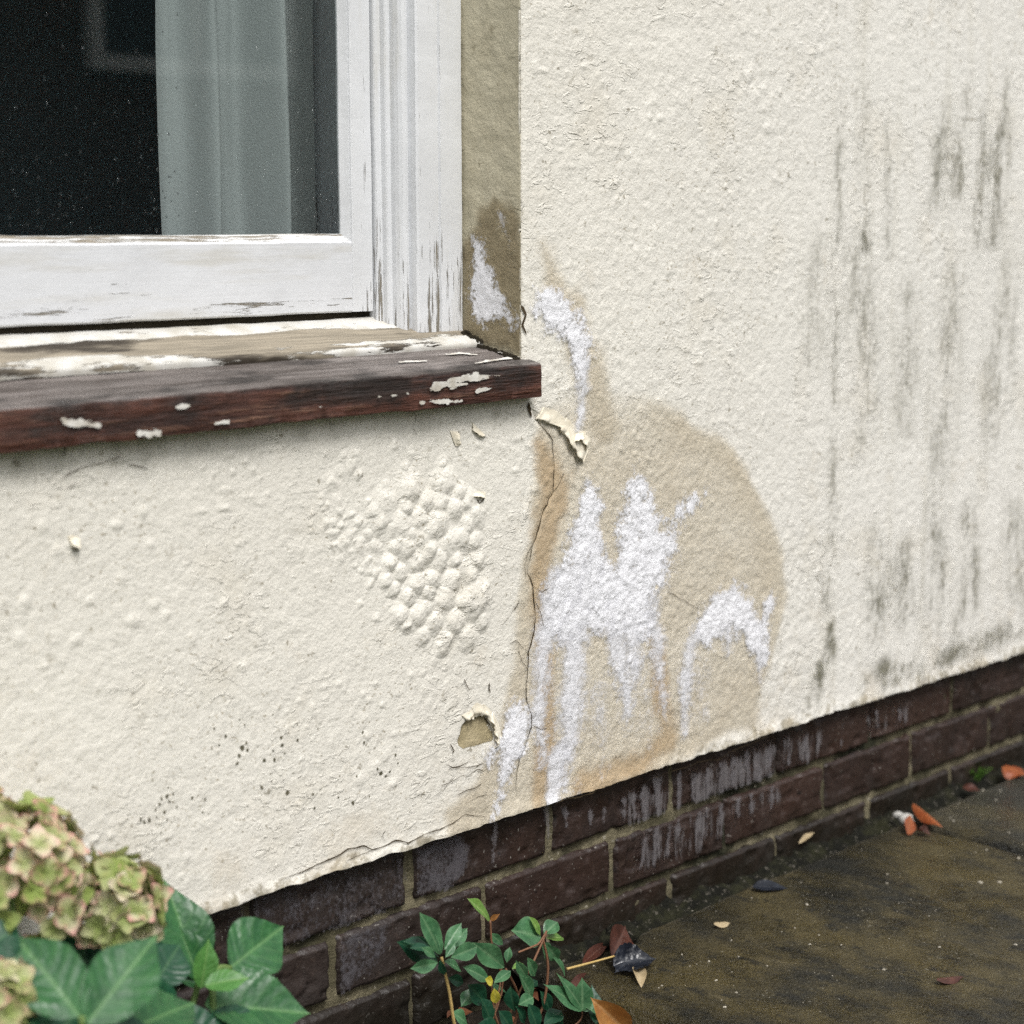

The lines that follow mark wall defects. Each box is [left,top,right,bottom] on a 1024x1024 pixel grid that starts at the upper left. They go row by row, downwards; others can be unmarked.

water stain [977,150,1002,239]
water stain [463,200,613,436]
peeling [419,352,513,405]
peeling [61,418,102,428]
peeling [136,429,162,438]
peeling [536,407,591,463]
crack [499,403,564,792]
water stain [417,412,789,893]
water stain [809,621,836,699]
water stain [876,660,898,685]
spalling [450,703,502,753]
crack [277,761,487,882]